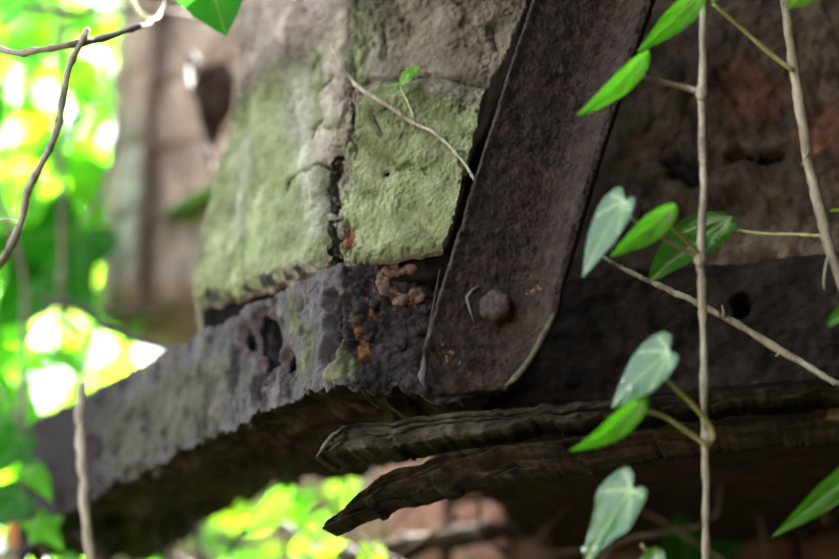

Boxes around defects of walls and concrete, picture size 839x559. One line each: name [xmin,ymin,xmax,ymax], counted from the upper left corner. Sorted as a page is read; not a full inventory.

damp [347,0,526,101]
damp [234,0,339,240]
peeling [204,287,223,303]
damp [223,216,251,298]
peeling [260,261,308,288]
spalling [262,319,297,373]
corrosion [352,318,372,361]